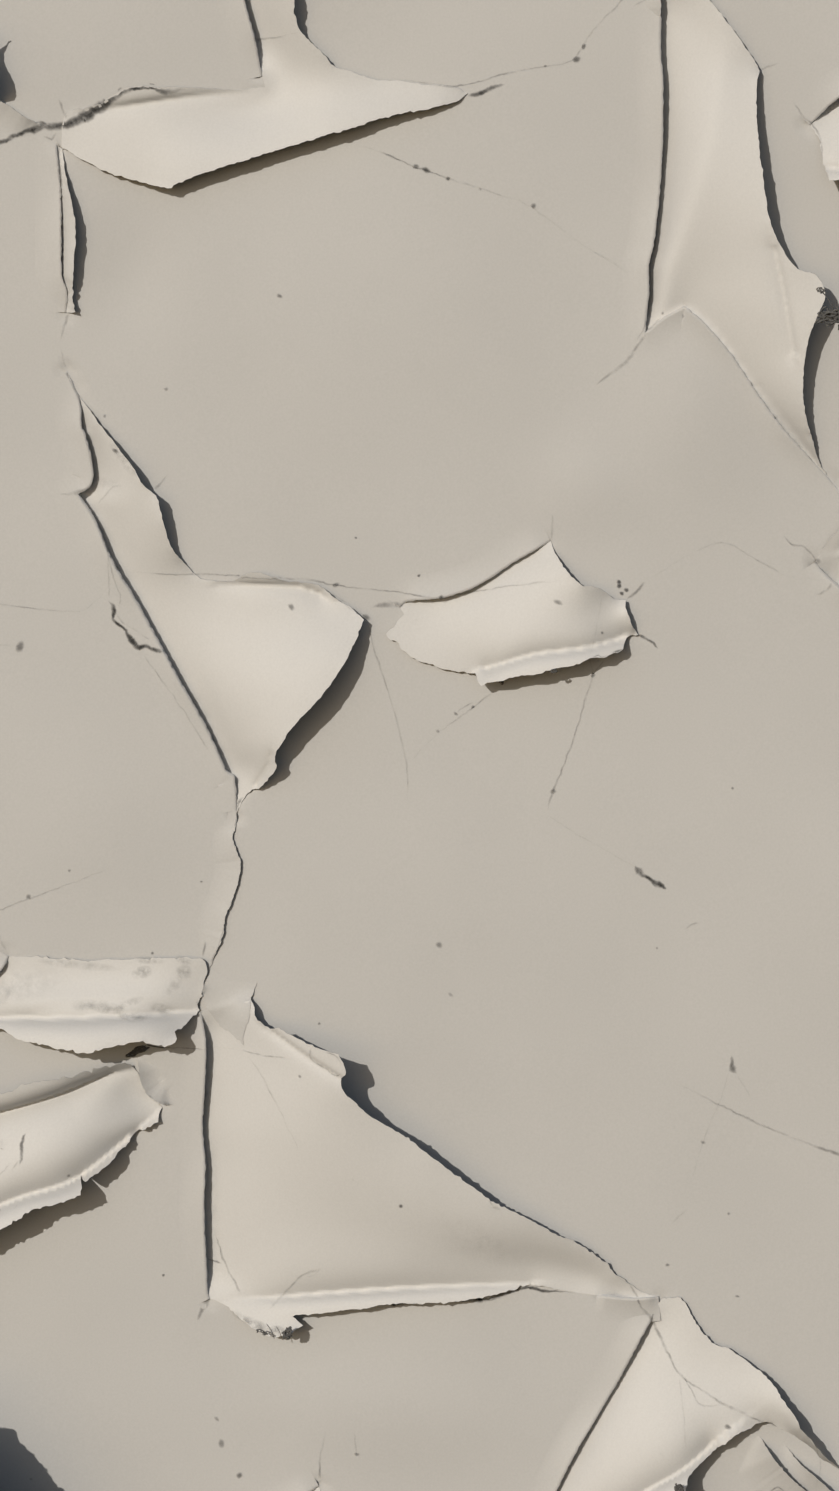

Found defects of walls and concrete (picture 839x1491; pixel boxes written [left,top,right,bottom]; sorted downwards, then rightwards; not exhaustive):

crack [0,87,159,143]
peeling [0,0,468,313]
peeling [619,0,839,520]
peeling [0,373,839,1491]